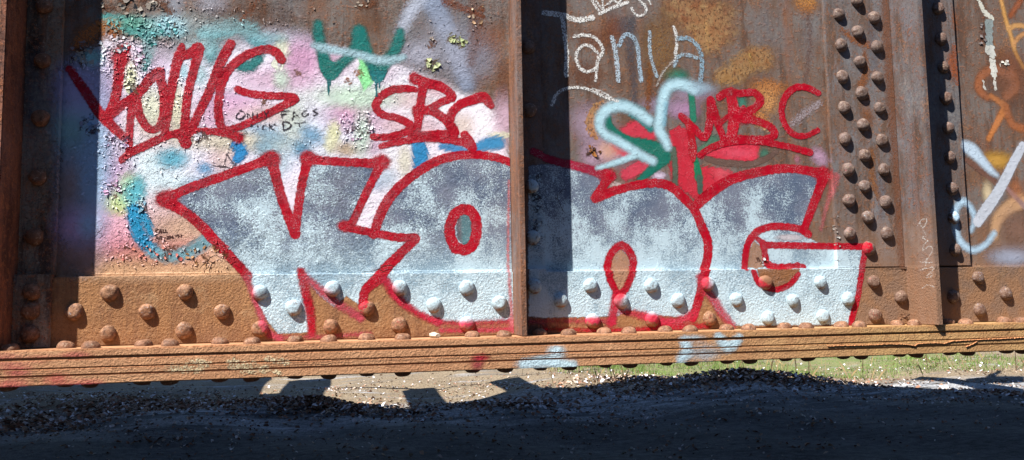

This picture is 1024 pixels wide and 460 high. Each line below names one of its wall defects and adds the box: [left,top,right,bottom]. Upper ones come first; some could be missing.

rust [69,19,122,51]
rust [584,100,611,140]
rust [583,19,623,45]
rust [642,0,735,110]
rust [714,46,786,132]
rust [840,0,905,269]